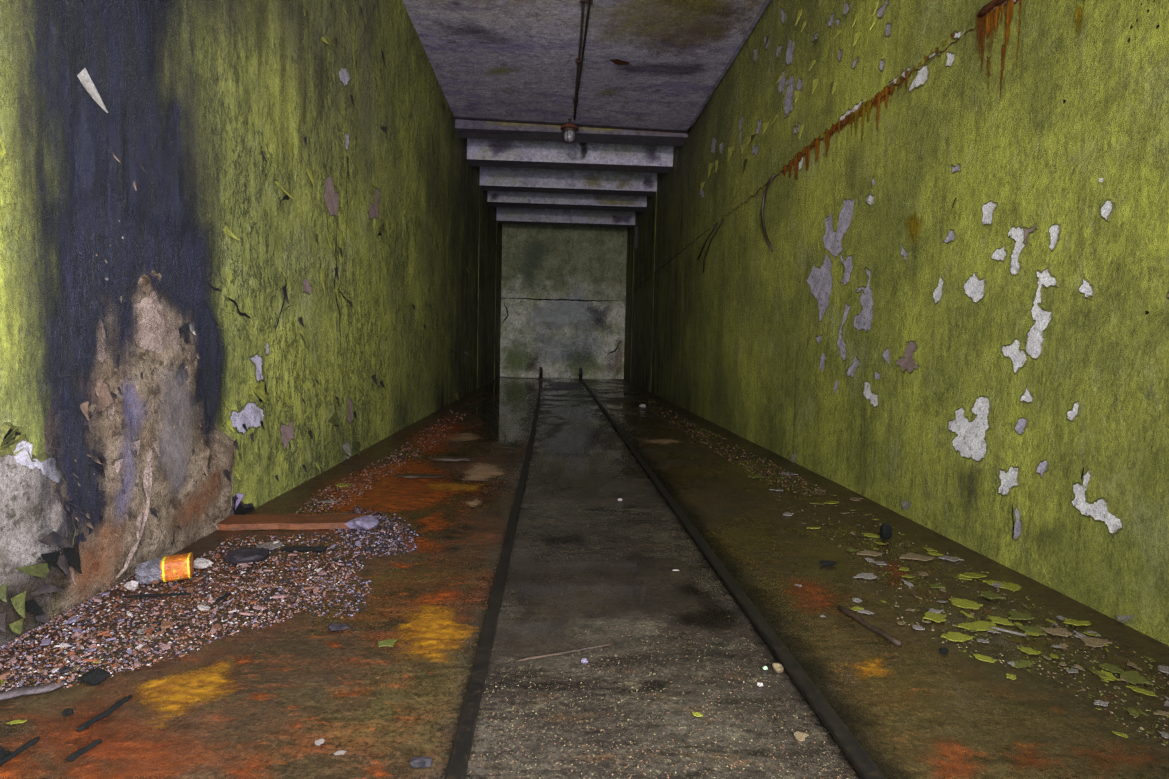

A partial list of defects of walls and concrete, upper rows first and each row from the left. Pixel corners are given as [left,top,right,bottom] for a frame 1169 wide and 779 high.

leakage [610,0,739,74]
rust [976,0,1022,97]
leakage [21,89,39,188]
crack [501,5,999,324]
rust [782,34,954,180]
peeling [806,179,920,408]
peeling [991,223,1062,276]
peeling [1001,268,1059,374]
spalling [0,269,306,647]
leakage [508,296,902,779]
peeling [948,395,992,462]
peeling [1070,469,1125,539]